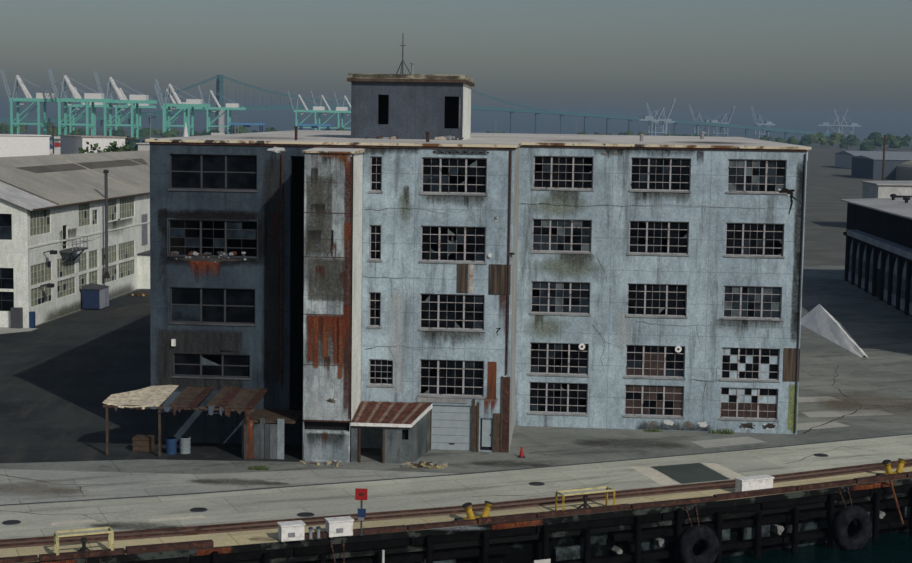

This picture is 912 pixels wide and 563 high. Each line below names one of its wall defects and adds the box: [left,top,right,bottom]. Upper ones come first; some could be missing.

rust [306,153,351,409]
crack [803,365,912,434]